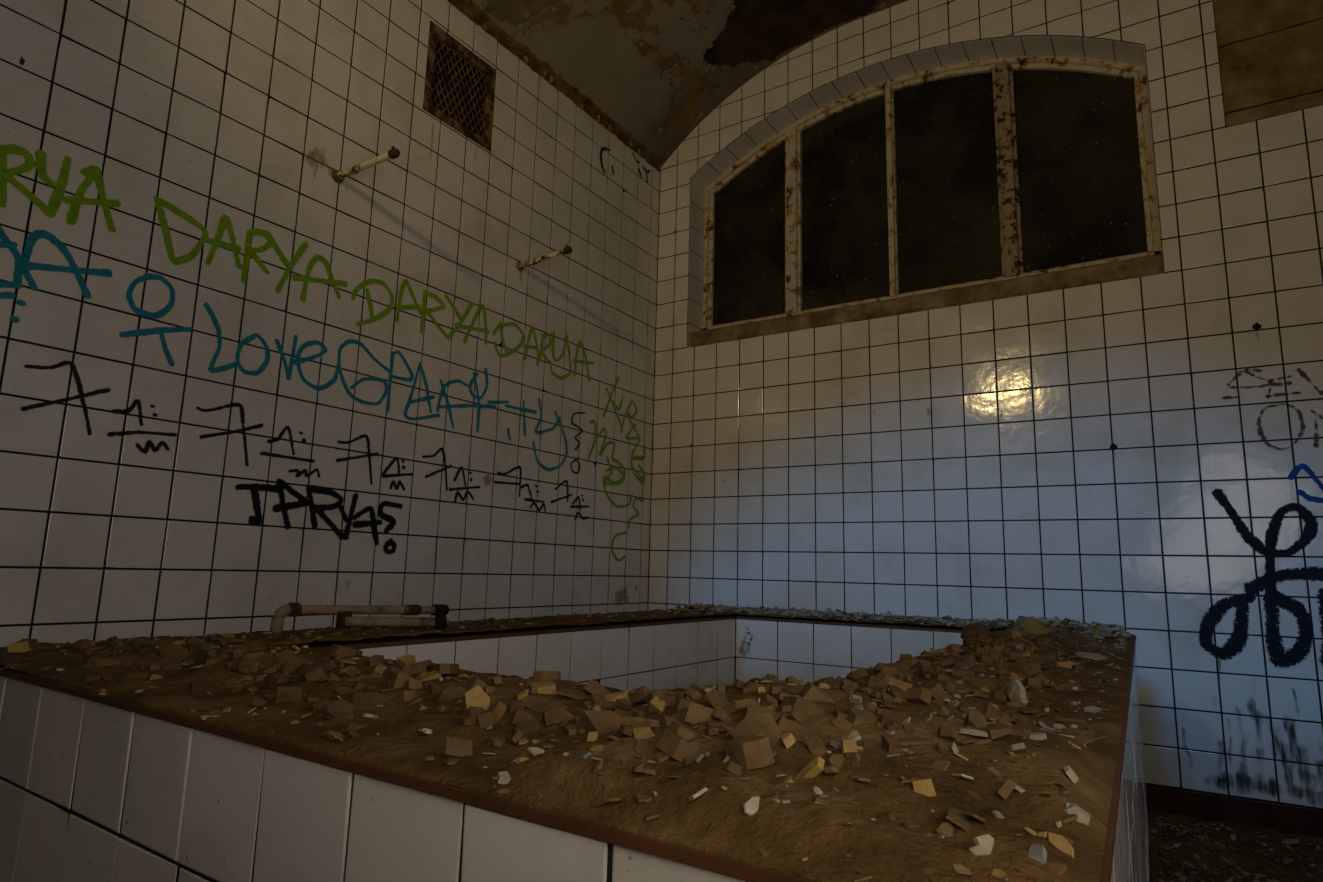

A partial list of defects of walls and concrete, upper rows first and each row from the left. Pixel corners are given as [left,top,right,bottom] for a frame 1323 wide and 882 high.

flaking render [448,0,886,171]